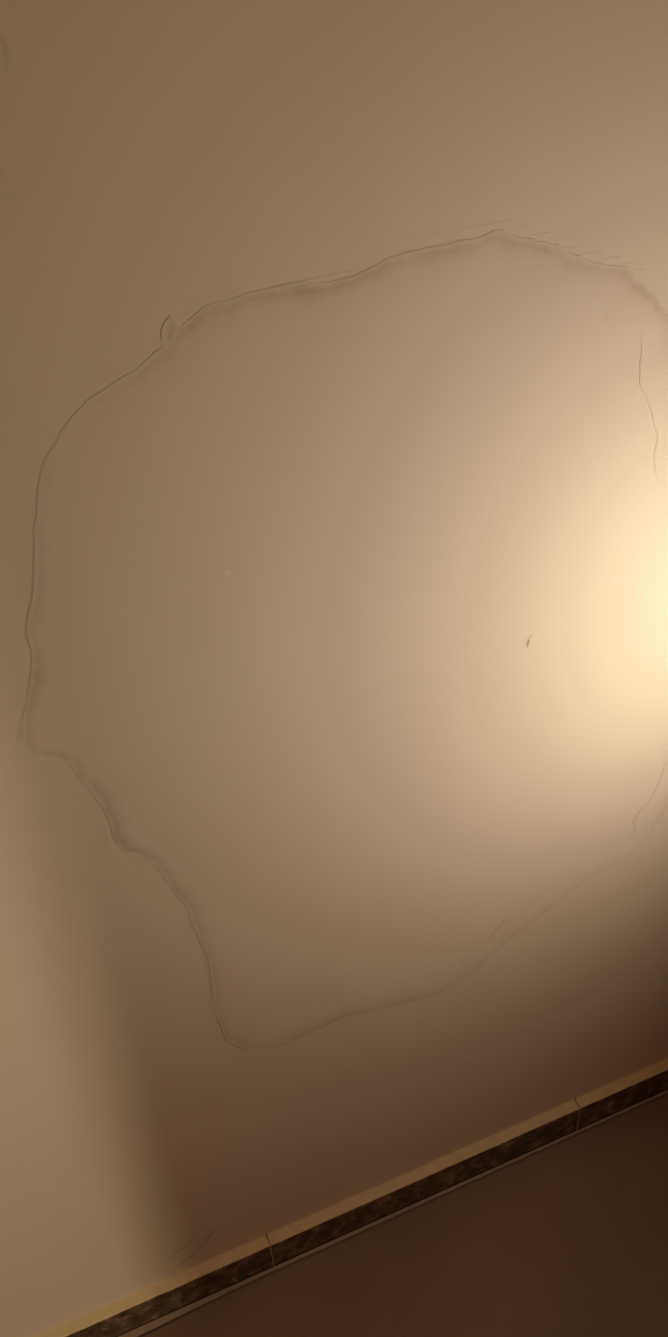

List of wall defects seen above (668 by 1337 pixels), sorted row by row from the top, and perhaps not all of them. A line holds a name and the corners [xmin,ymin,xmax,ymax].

damp [11,220,668,1055]